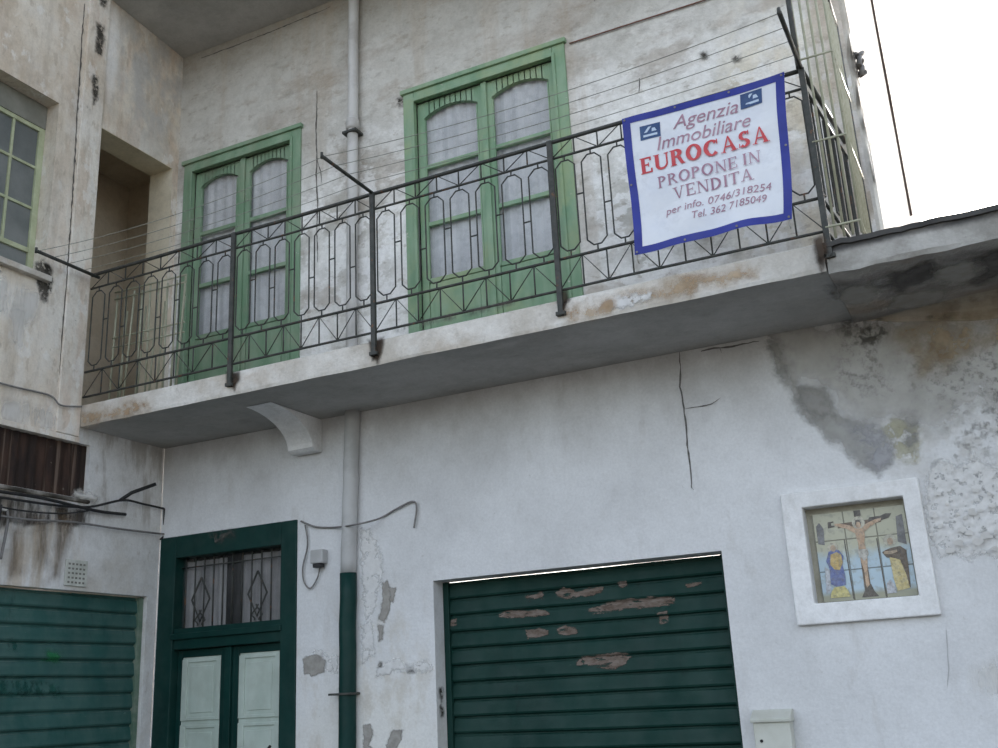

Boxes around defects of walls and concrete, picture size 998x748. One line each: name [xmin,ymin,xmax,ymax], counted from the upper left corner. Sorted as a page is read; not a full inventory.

damp [95,24,104,55]
damp [35,261,53,301]
damp [884,262,938,291]
damp [771,321,998,458]
crack [679,341,759,490]
peeling [926,453,998,561]
peeling [360,529,432,676]
peeling [303,650,338,677]
peeling [363,724,373,748]
peeling [386,730,402,748]